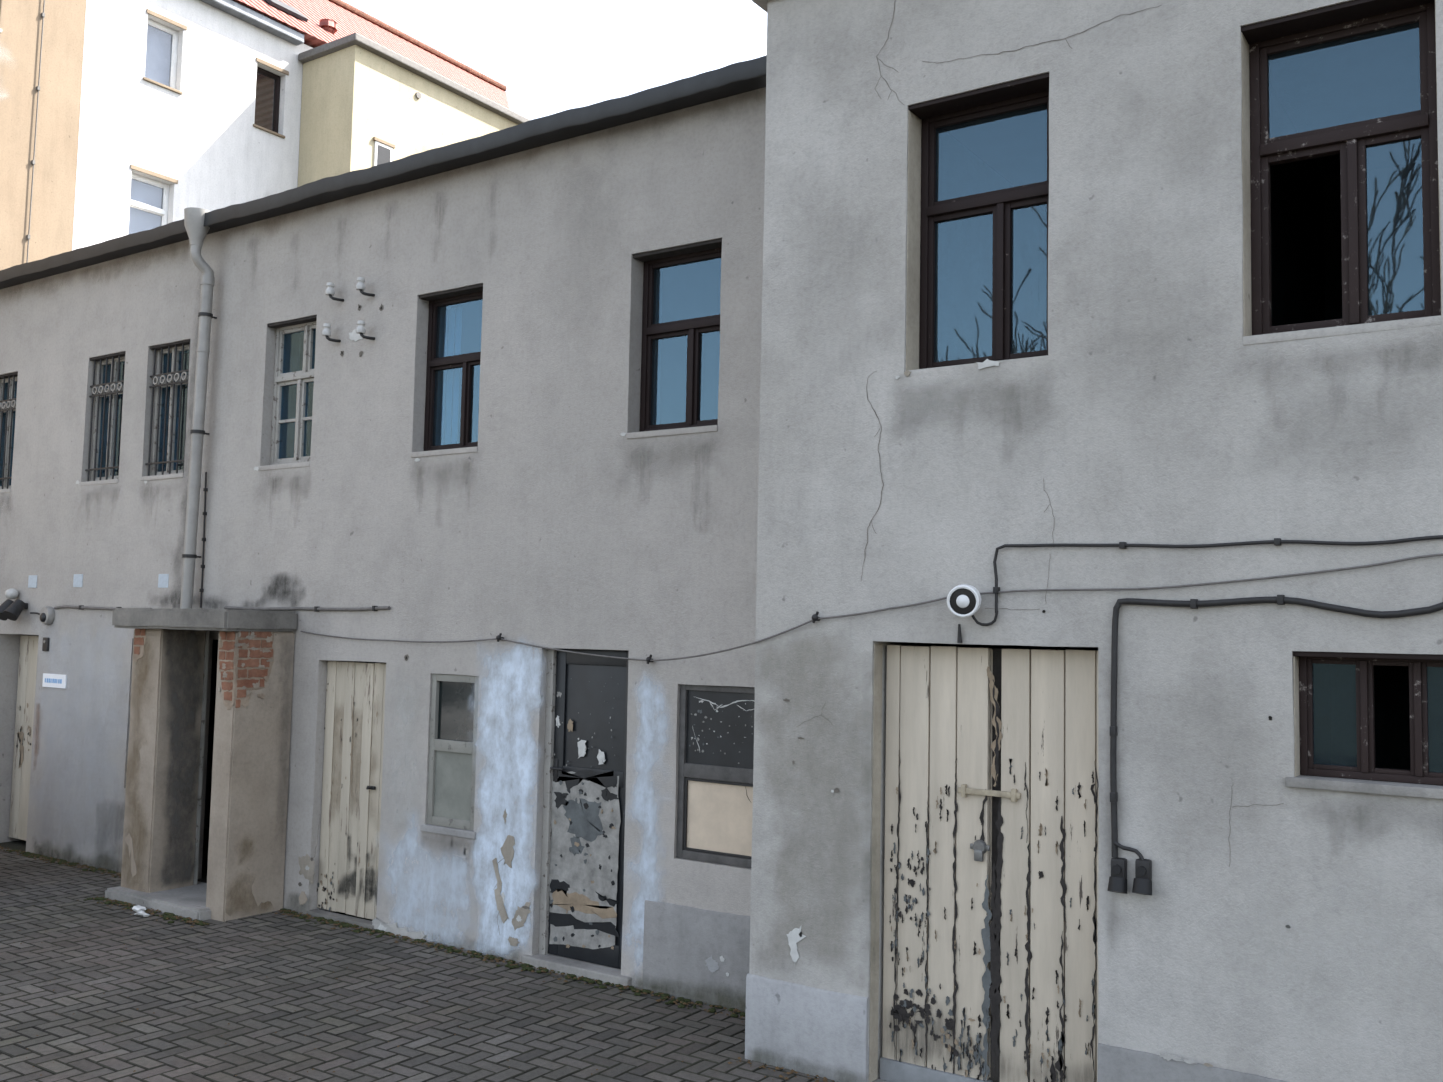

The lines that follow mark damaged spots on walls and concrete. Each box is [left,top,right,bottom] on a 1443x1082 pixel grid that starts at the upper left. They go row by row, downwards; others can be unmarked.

crack [875,2,1161,105]
crack [861,371,884,579]
water stain [268,577,289,597]
flaking render [218,631,275,710]
spalling [372,917,427,939]
flaking render [787,926,806,966]